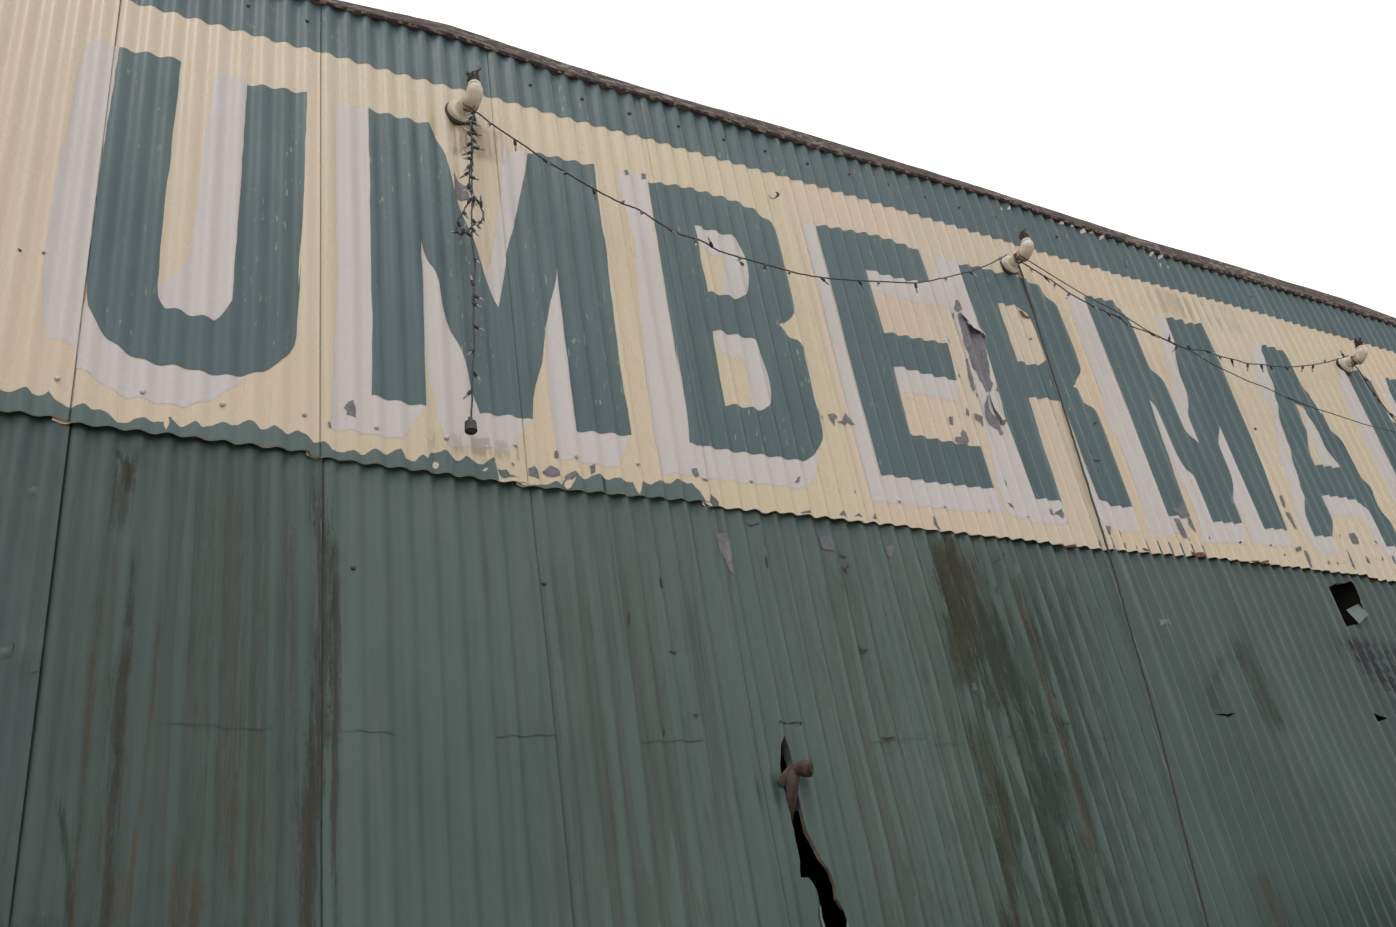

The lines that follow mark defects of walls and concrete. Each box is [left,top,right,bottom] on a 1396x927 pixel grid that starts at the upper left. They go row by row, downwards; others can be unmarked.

peeling [483,450,606,491]
peeling [949,300,1007,443]
water stain [101,651,131,927]
water stain [299,516,340,927]
water stain [929,541,1096,927]